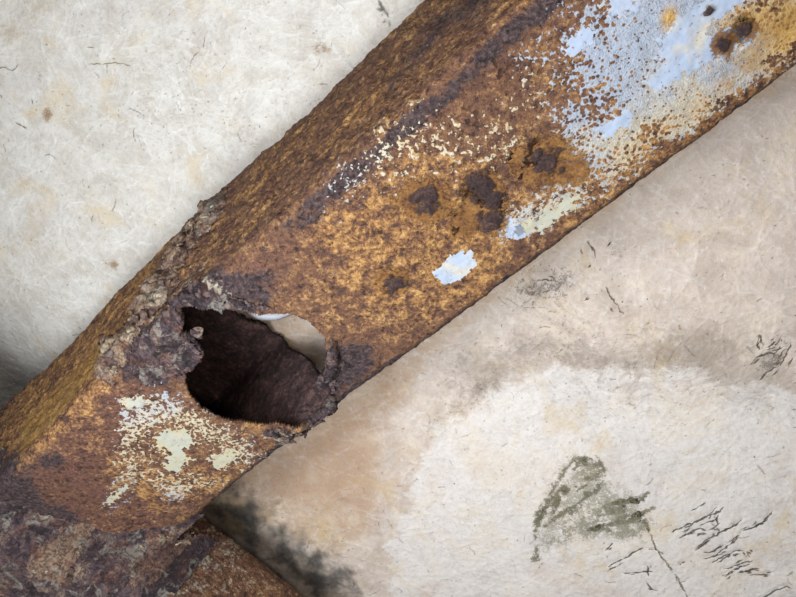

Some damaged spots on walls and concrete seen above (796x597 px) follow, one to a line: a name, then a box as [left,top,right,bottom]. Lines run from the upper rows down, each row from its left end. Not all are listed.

peeling [561,25,599,58]
peeling [642,0,760,93]
rust [710,12,763,62]
peeling [595,108,633,140]
rust [388,132,596,242]
peeling [503,192,582,240]
rust [92,187,229,387]
peeling [121,395,146,409]
peeling [152,428,243,474]
damp [530,457,654,562]
rust [26,523,95,585]
rust [127,523,201,588]